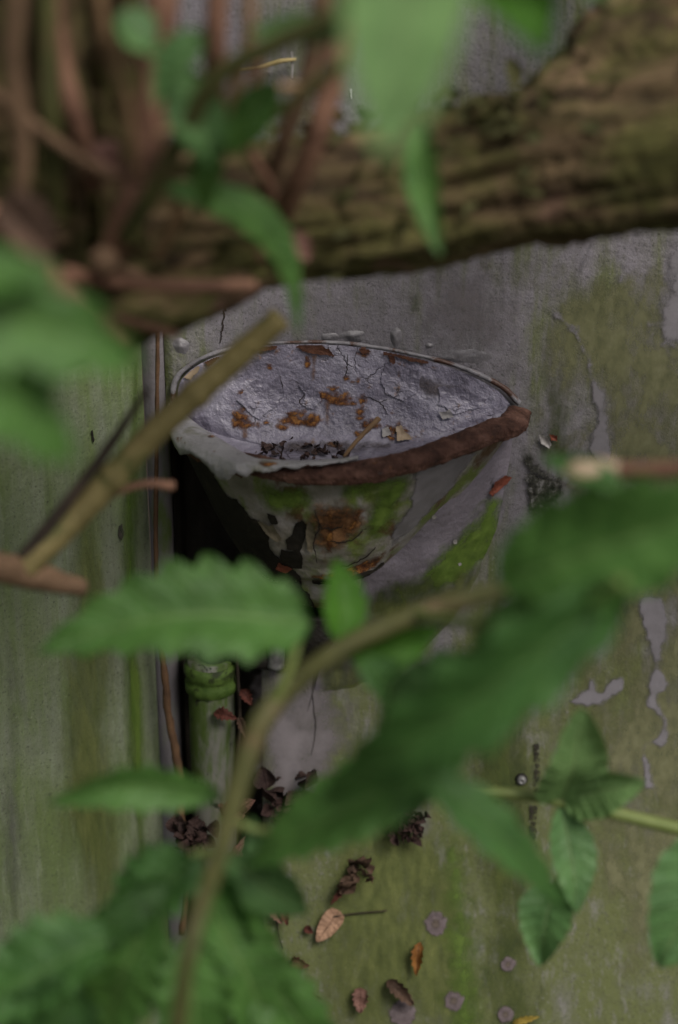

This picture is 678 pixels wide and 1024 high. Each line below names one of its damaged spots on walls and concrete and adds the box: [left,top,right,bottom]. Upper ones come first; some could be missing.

corrosion [232,376,409,440]